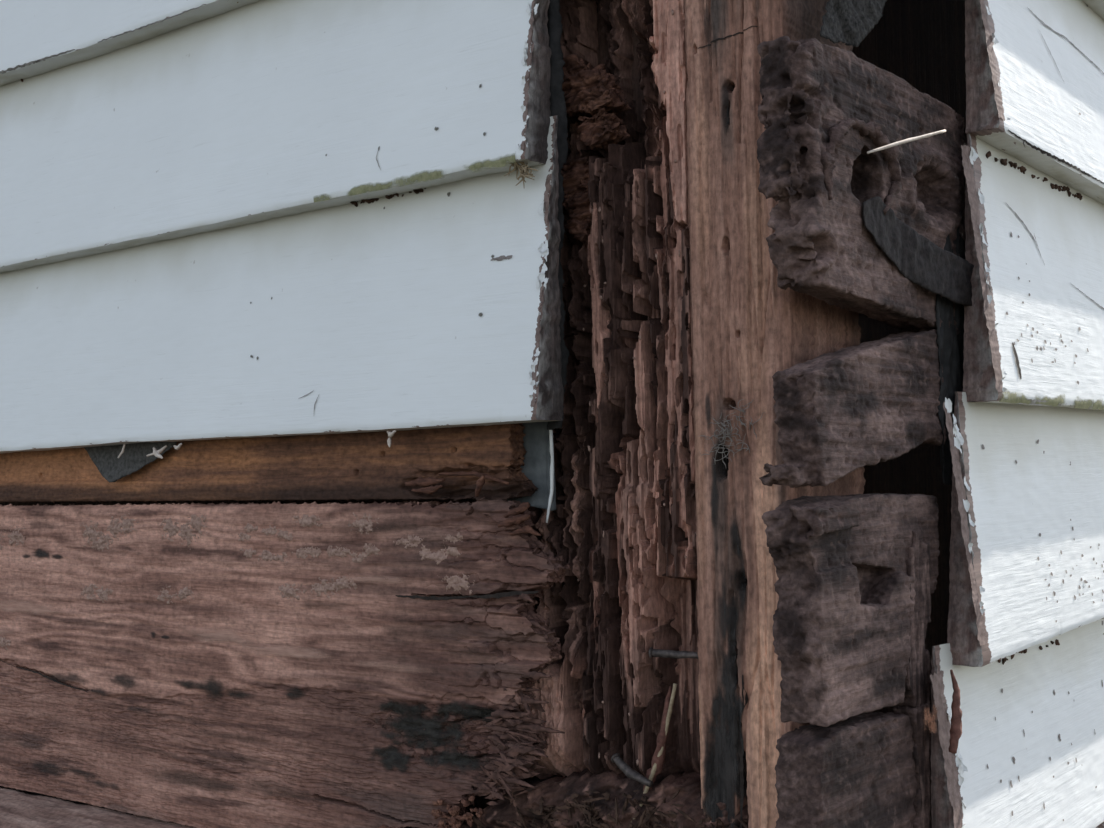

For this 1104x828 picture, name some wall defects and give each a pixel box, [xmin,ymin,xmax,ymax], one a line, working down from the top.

peeling [943,397,988,646]
peeling [1037,544,1104,603]
crack [1,660,88,693]
damp [374,701,494,771]
damp [703,525,747,828]
peeling [930,670,968,828]